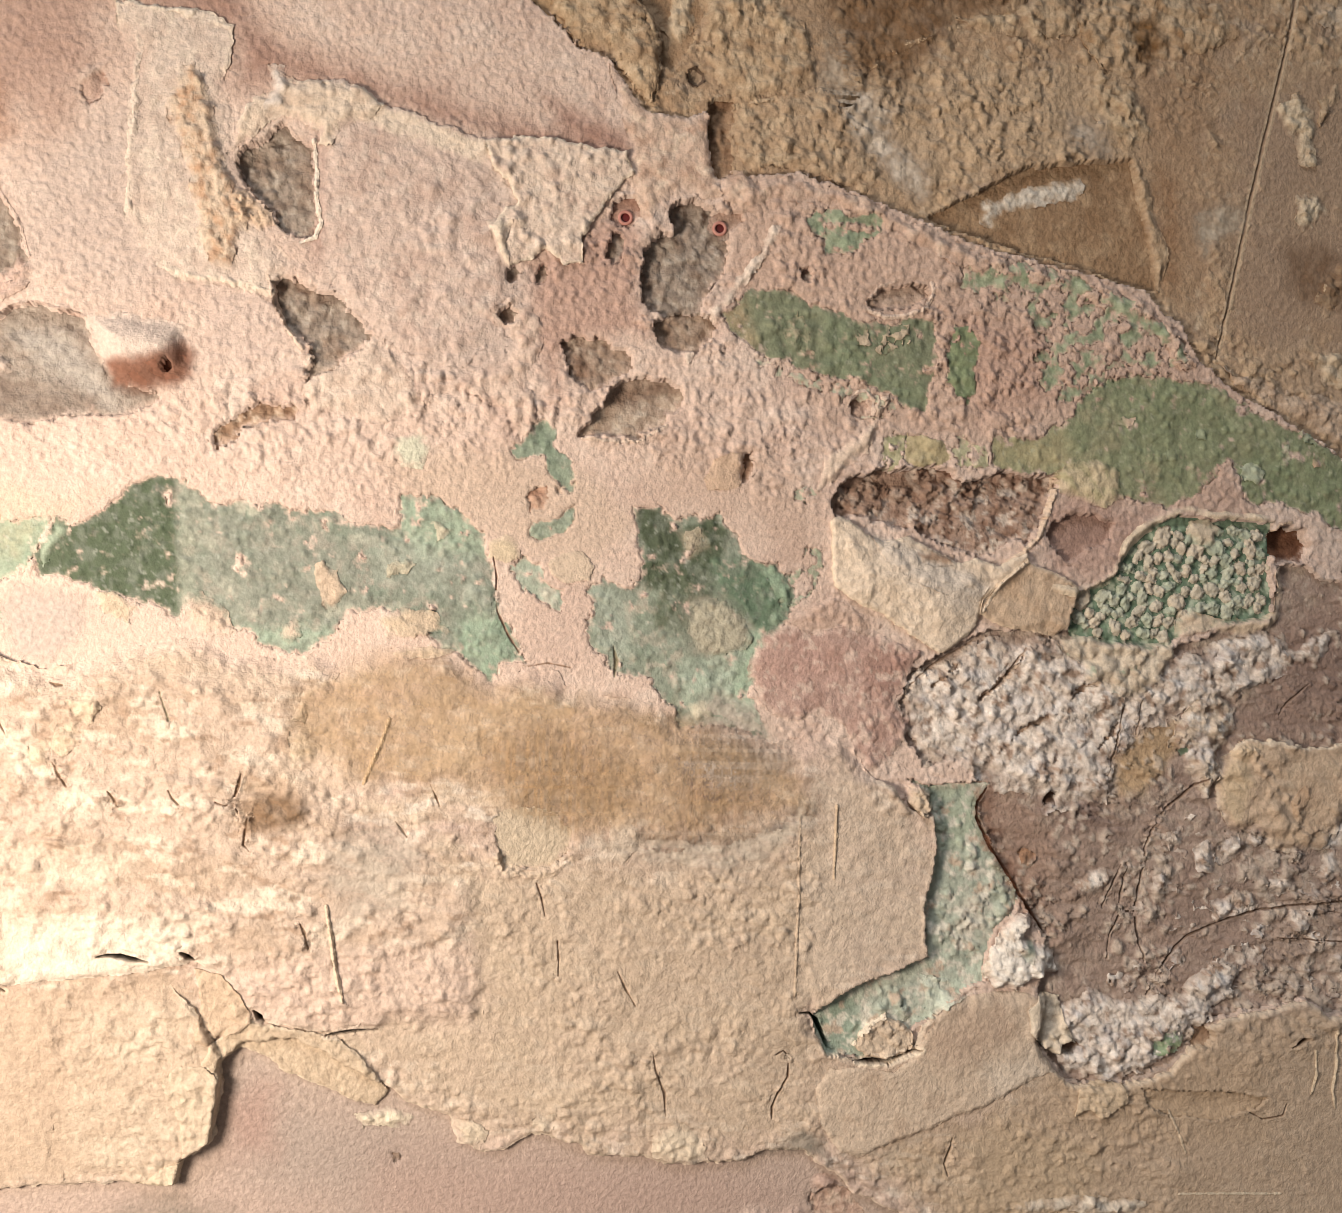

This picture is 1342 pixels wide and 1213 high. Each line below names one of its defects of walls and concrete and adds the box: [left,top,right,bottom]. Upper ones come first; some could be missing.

spalling [0,189,159,425]
corrosion [109,350,190,388]
spalling [109,0,1342,504]
crack [1211,0,1301,364]
water stain [323,673,786,823]
peeling [0,372,1342,1213]
water stain [644,803,815,868]
crack [1097,773,1342,1000]